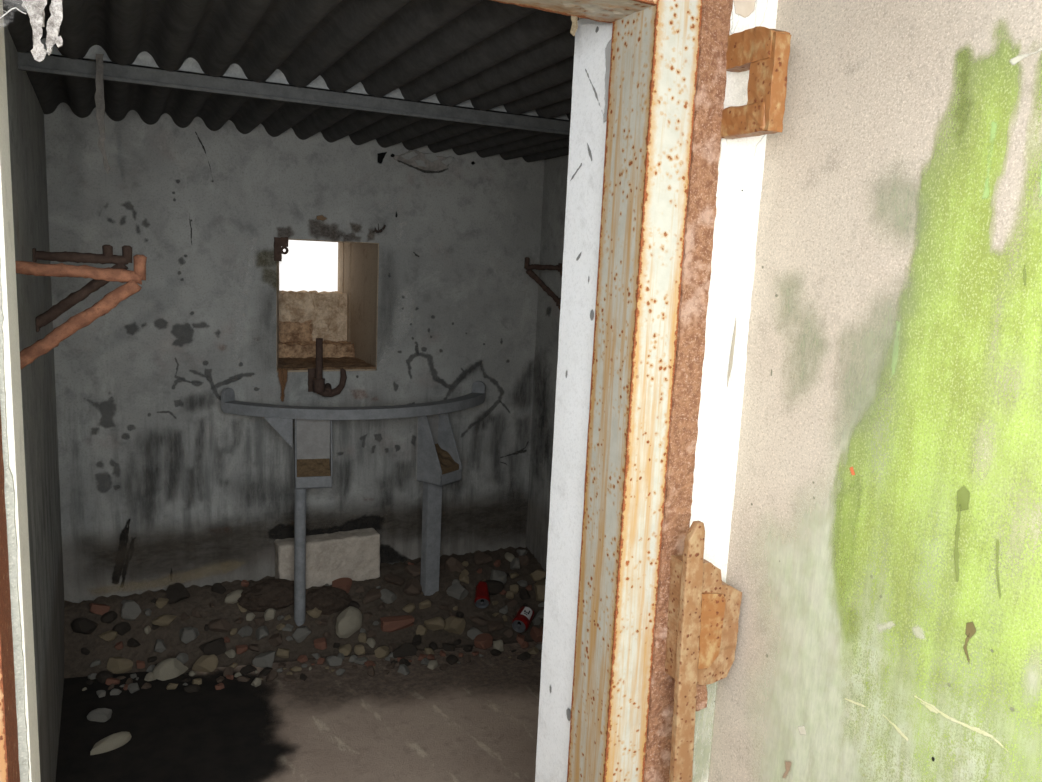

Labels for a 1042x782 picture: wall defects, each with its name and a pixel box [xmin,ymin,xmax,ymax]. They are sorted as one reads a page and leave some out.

damp [89,393,135,439]
damp [174,361,212,409]
crack [157,358,254,419]
damp [360,434,416,453]
crack [406,342,510,437]
damp [96,436,179,519]
damp [93,484,358,574]
damp [441,483,528,538]
damp [954,486,970,581]
damp [963,622,976,664]